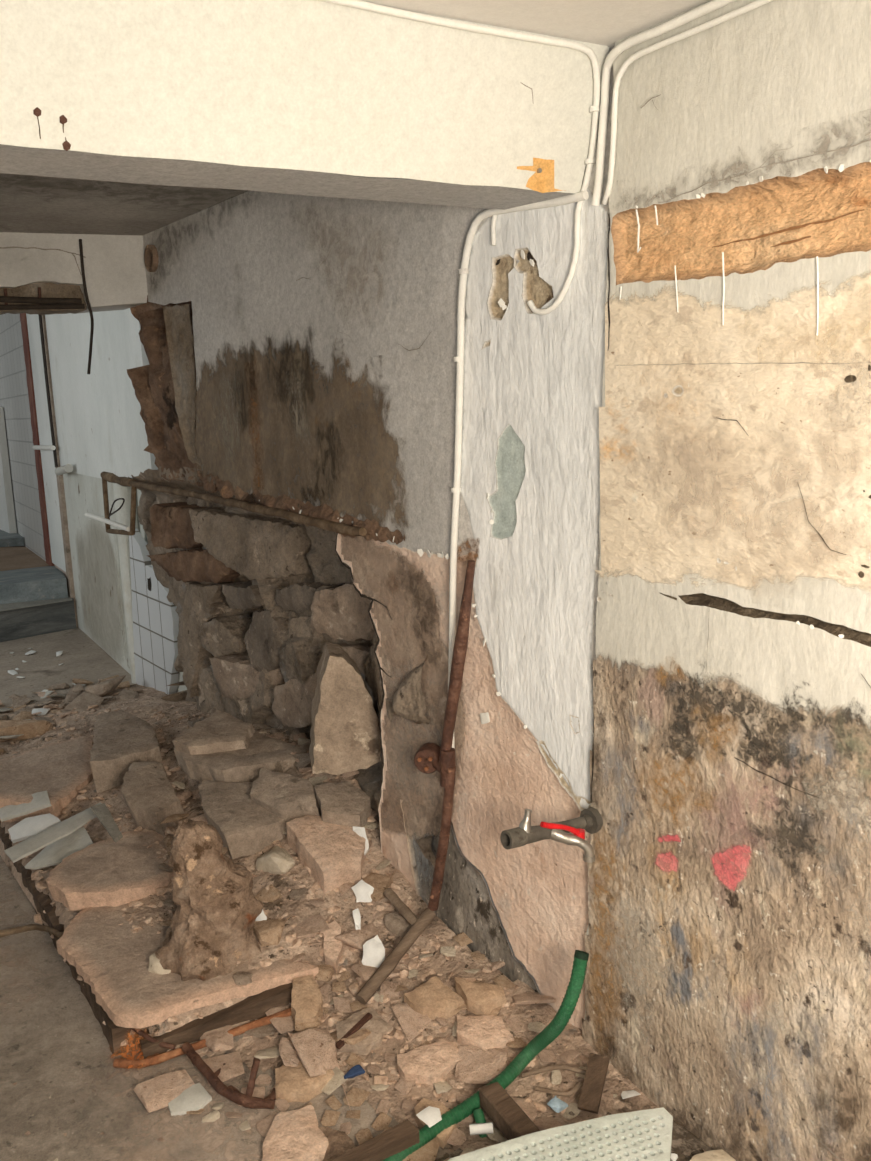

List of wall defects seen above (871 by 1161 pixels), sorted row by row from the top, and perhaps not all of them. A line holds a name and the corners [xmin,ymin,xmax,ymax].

rust [59,115,71,151]
spalling [0,282,87,315]
spalling [487,248,554,321]
peeling [595,160,871,602]
leakage [190,338,407,535]
peeling [163,304,591,1030]
crack [660,593,871,668]
crack [734,757,823,800]
leakage [582,656,871,1161]